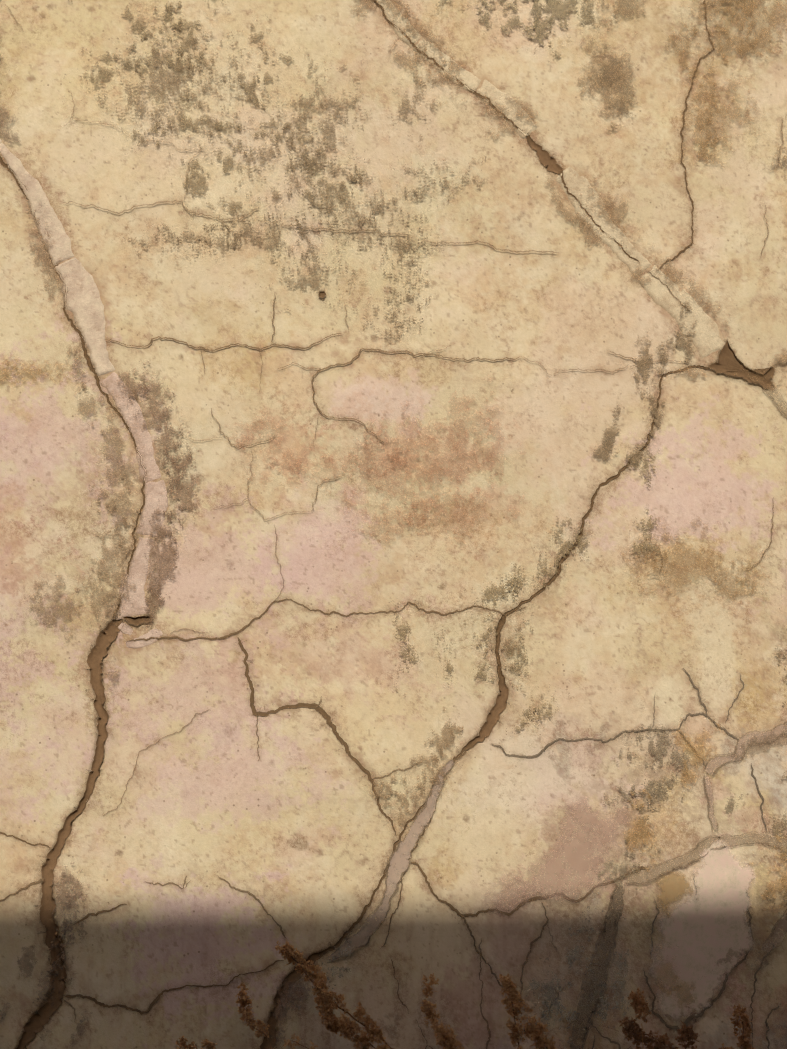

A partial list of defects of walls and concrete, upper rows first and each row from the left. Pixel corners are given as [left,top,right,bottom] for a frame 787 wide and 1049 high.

leakage [74,1,489,341]
crack [105,297,638,445]
crack [281,224,557,253]
crack [373,0,715,308]
crack [639,360,711,451]
crack [0,156,283,1049]
crack [129,462,787,1049]
peeling [651,843,754,1019]